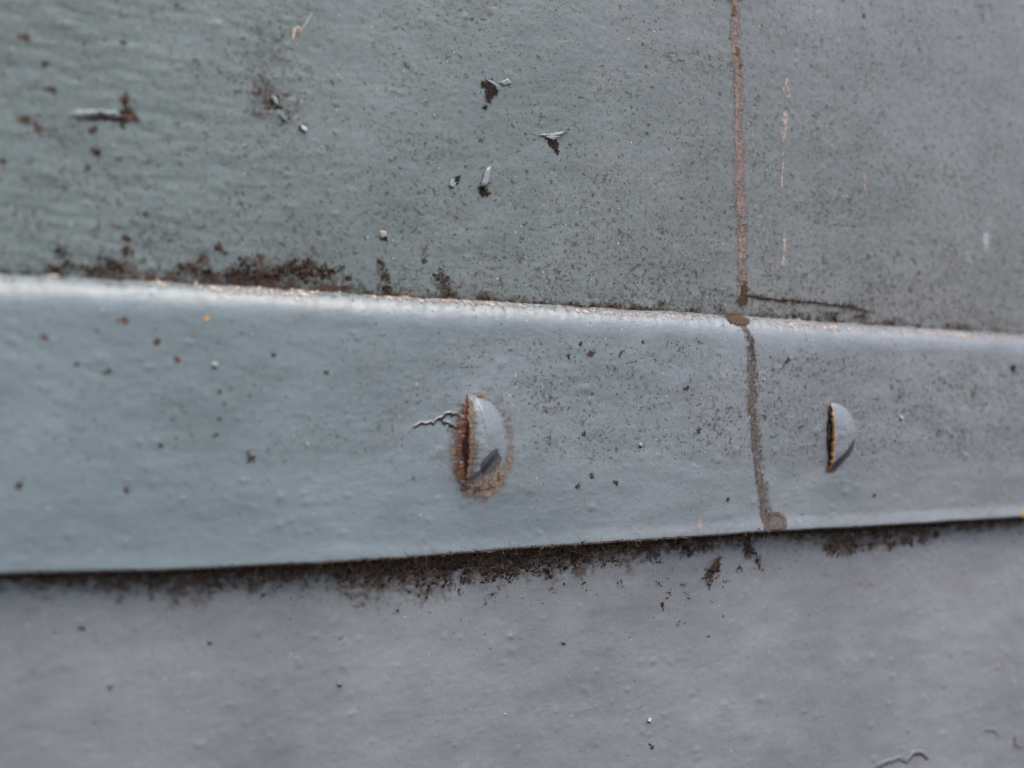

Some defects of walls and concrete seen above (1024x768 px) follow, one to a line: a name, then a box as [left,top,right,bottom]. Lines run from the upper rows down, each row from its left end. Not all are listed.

peeling [67,93,139,123]
peeling [481,77,512,110]
peeling [540,127,573,155]
peeling [478,166,492,197]
corrosion [0,0,1024,607]
crack [746,294,871,312]
crack [413,396,483,480]